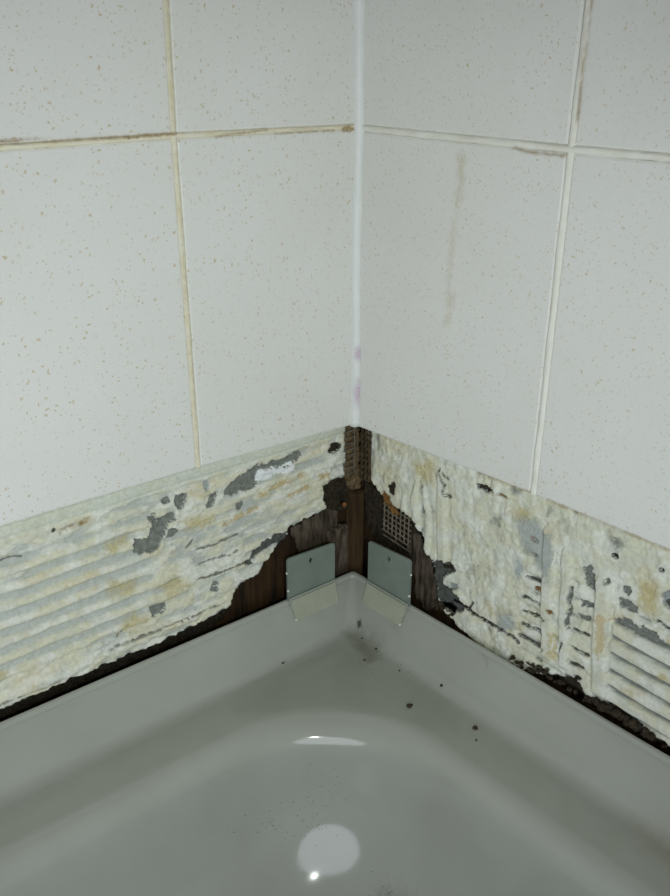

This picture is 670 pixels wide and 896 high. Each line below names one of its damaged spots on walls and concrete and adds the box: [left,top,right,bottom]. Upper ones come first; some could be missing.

spalling [203,451,301,510]
spalling [133,493,187,554]
spalling [245,531,287,565]
spalling [149,602,165,616]
spalling [433,560,465,613]
spalling [619,586,670,647]